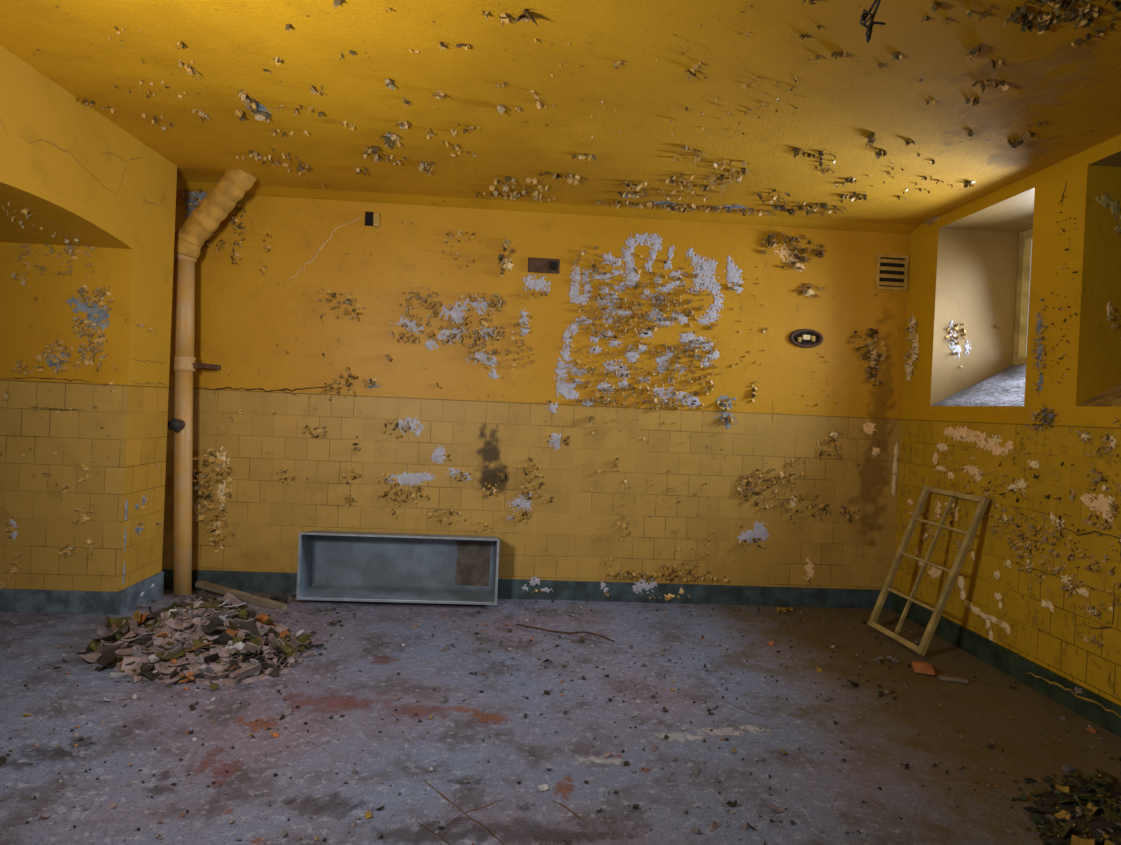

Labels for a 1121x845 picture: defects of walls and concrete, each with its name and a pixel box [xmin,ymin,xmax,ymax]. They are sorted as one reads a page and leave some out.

peeling [1002,0,1121,50]
peeling [476,172,587,202]
peeling [596,76,904,217]
peeling [1,202,116,392]
peeling [388,239,551,379]
peeling [546,232,767,447]
peeling [760,232,826,298]
peeling [192,446,234,553]
peeling [377,444,555,534]
peeling [736,458,859,548]
peeling [892,418,1121,618]
peeling [957,575,1010,642]